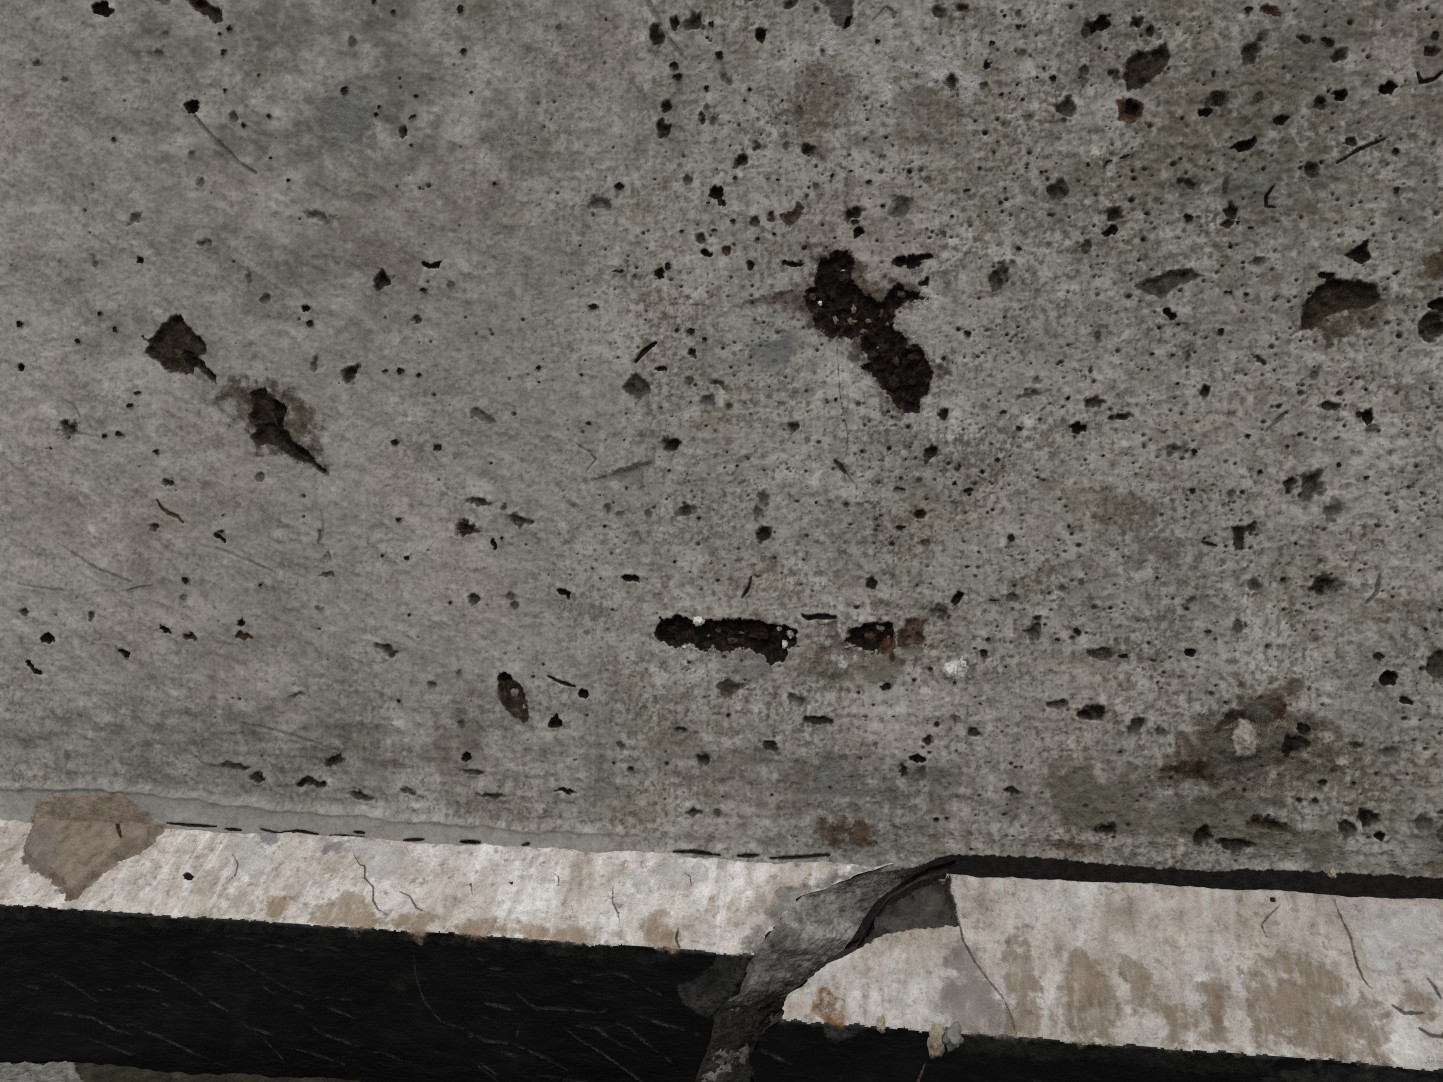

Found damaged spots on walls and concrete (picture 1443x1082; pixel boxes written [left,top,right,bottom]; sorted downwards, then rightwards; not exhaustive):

spalling [142,314,216,383]
rust [741,246,951,421]
spalling [1300,239,1386,347]
spalling [248,388,327,473]
peeling [678,864,874,1018]
spalling [863,875,959,945]